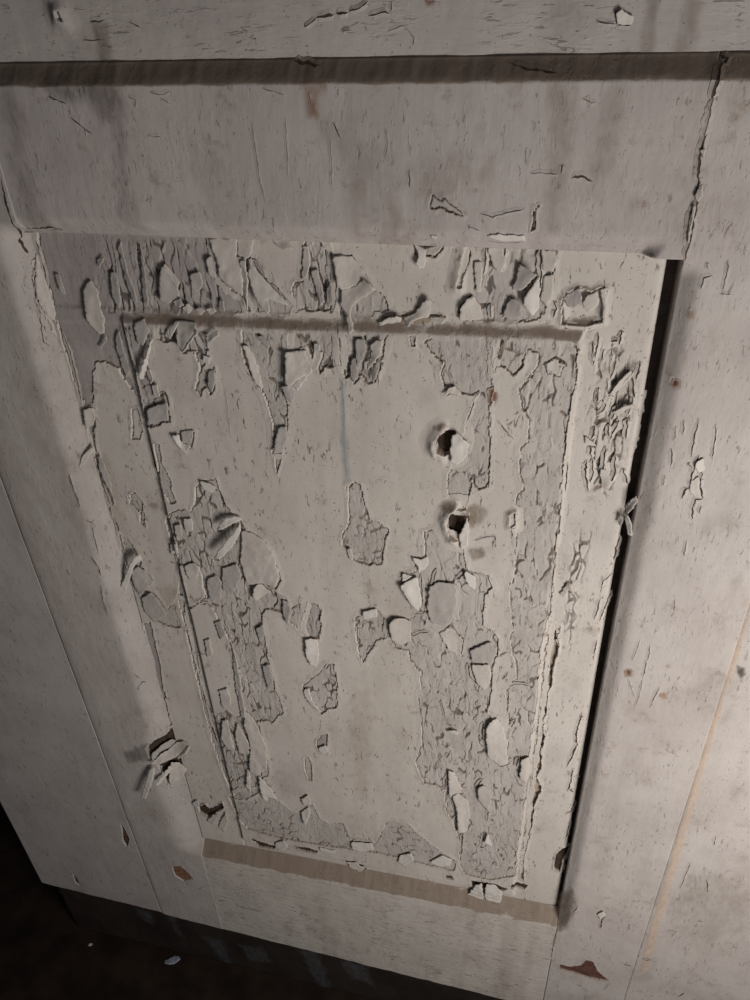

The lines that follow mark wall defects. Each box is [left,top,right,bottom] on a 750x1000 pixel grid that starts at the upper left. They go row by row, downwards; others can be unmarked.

peeling [596,9,634,30]
peeling [423,188,469,222]
crack [682,51,733,297]
peeling [23,201,586,903]